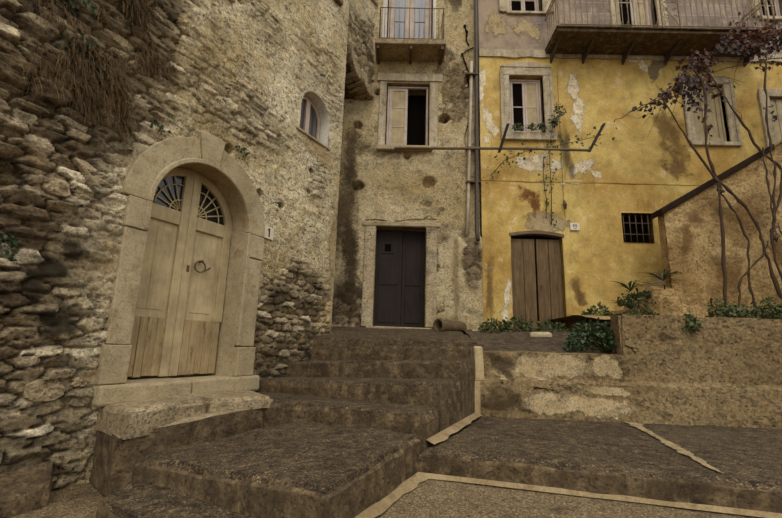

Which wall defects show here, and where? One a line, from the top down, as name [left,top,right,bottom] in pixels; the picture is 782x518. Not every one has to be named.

damp [336,131,363,315]